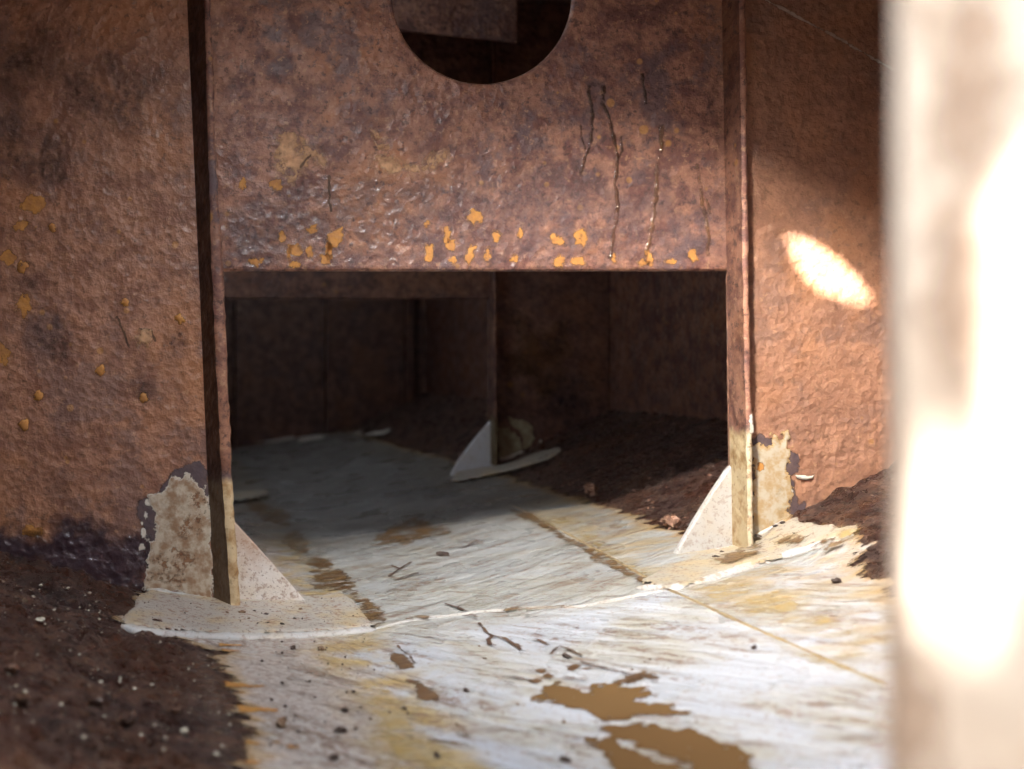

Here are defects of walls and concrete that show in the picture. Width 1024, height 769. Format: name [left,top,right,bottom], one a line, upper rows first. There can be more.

rust [279,224,344,268]
rust [425,226,500,265]
rust [466,208,483,225]
rust [550,228,588,267]
rust [580,85,624,263]
rust [638,175,710,267]
peeling [129,461,214,606]
peeling [151,414,889,769]